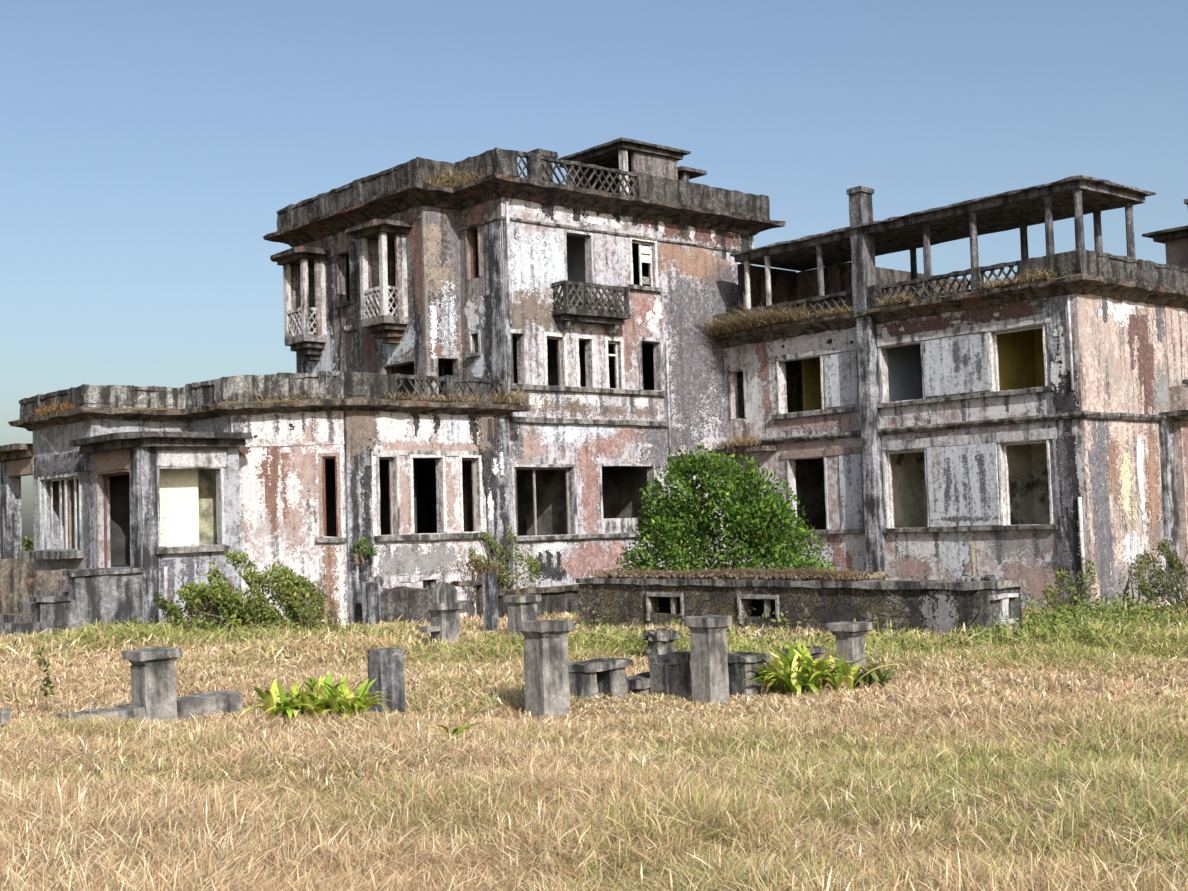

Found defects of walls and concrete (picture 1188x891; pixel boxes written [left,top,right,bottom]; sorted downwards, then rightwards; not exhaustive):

water stain [541,204,659,231]
peeling [404,325,416,349]
peeling [425,222,455,359]
peeling [465,294,486,331]
peeling [471,353,487,378]
water stain [468,231,753,556]
water stain [1151,304,1169,415]
peeling [239,411,334,558]
water stain [326,410,476,596]
peeling [884,520,932,580]
peeling [995,560,1061,608]
water stain [931,370,1167,611]